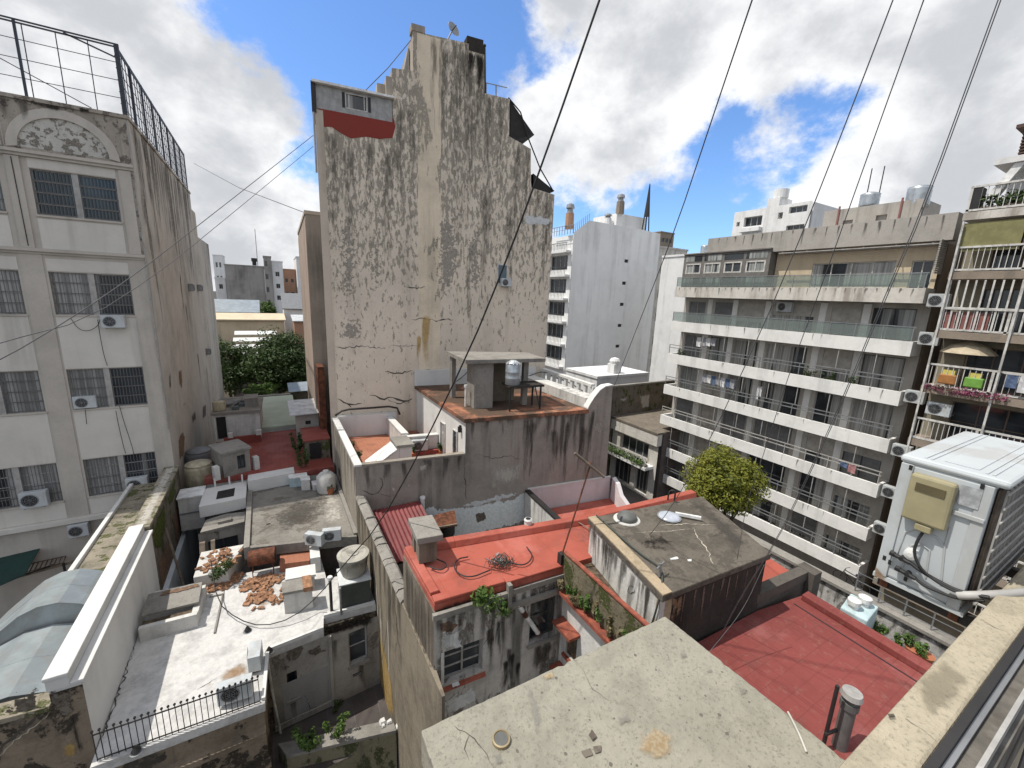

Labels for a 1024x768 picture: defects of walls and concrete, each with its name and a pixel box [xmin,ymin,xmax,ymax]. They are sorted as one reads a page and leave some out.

damp [469,53,483,87]
damp [417,318,429,348]
crack [339,345,430,407]
damp [524,413,594,453]
damp [333,505,558,711]